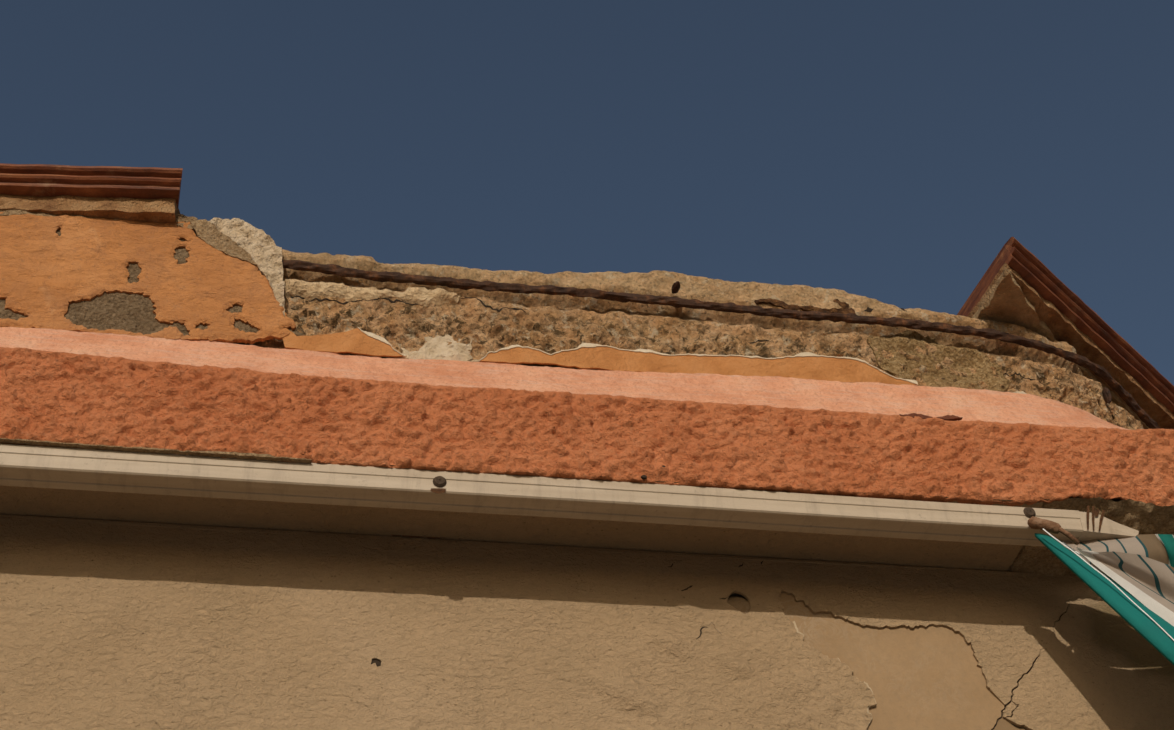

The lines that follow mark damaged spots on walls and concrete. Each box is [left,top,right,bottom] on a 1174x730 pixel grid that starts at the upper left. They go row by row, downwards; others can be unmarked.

spalling [0,209,98,236]
peeling [0,299,27,320]
peeling [64,263,208,336]
spalling [174,214,1144,430]
spalling [727,596,750,614]
flaking render [780,593,1026,730]
crack [991,656,1039,730]